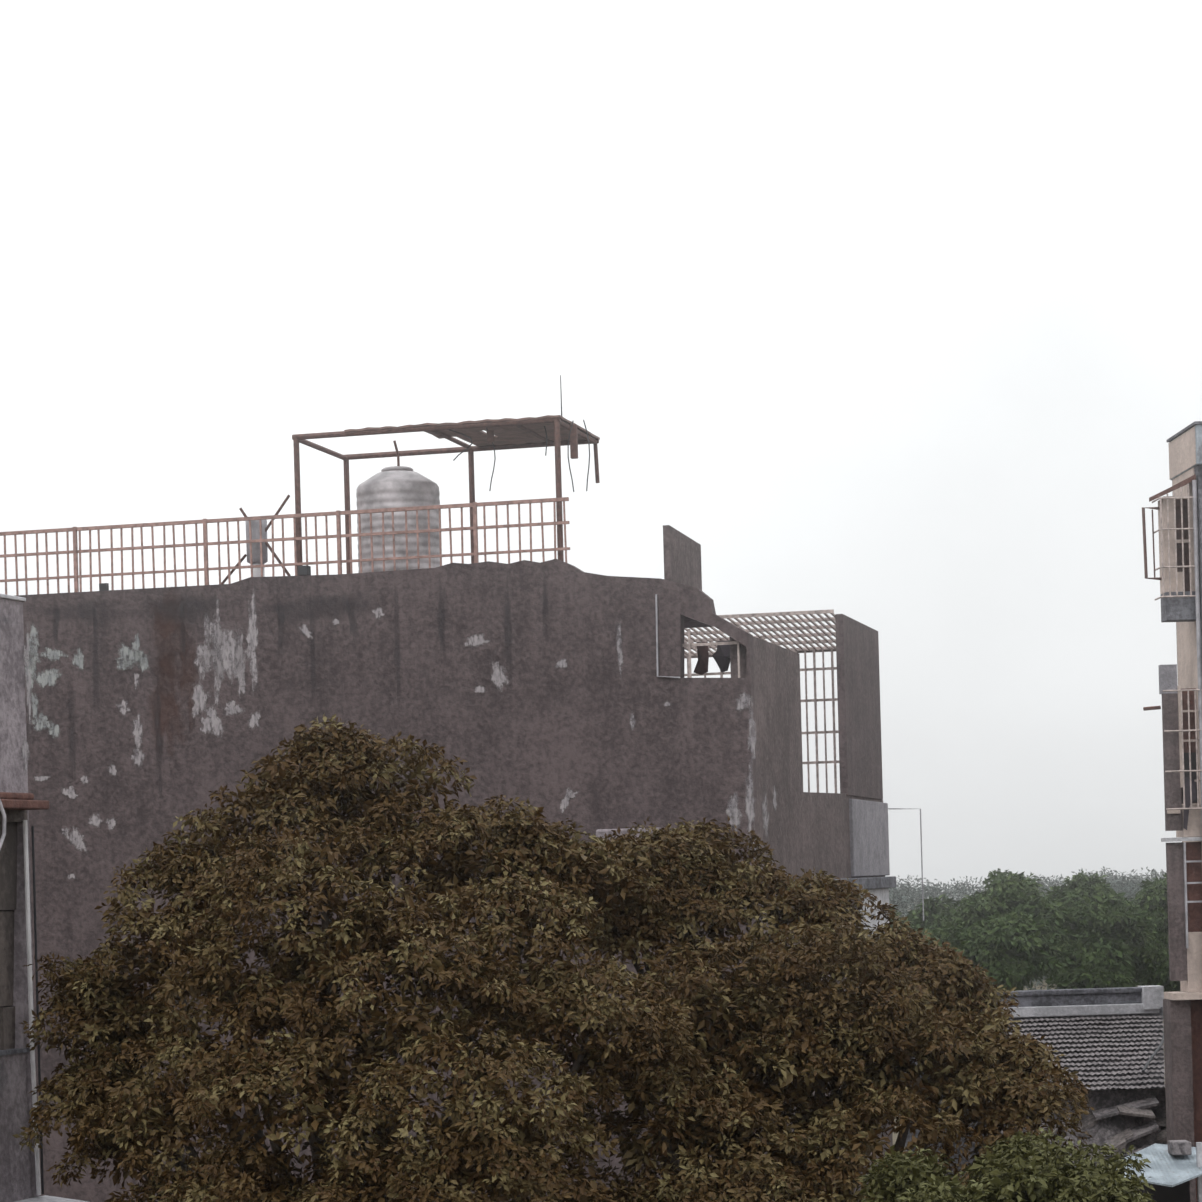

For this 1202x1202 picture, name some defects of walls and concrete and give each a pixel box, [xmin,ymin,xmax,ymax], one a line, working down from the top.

peeling [25,626,84,737]
peeling [117,635,149,686]
peeling [192,594,261,735]
peeling [118,700,144,765]
peeling [62,775,88,799]
peeling [62,814,116,851]